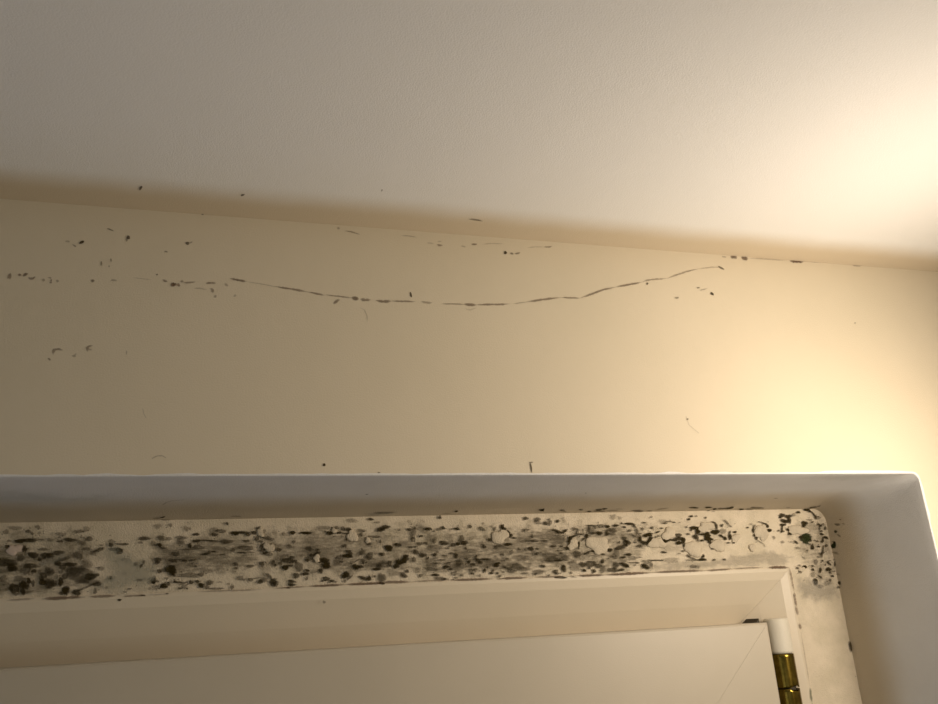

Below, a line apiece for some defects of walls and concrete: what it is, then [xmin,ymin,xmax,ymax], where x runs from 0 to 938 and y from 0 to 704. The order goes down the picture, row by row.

damp [0,507,744,601]
damp [747,507,841,585]